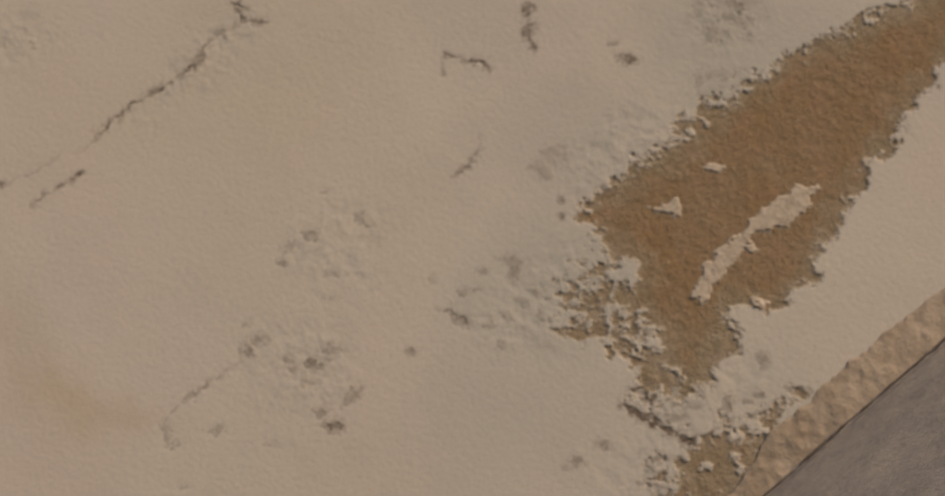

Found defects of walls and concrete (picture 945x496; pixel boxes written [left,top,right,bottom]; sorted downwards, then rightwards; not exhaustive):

crack [0,0,273,214]
crack [447,133,485,183]
crack [437,49,497,78]
peeling [455,0,945,496]